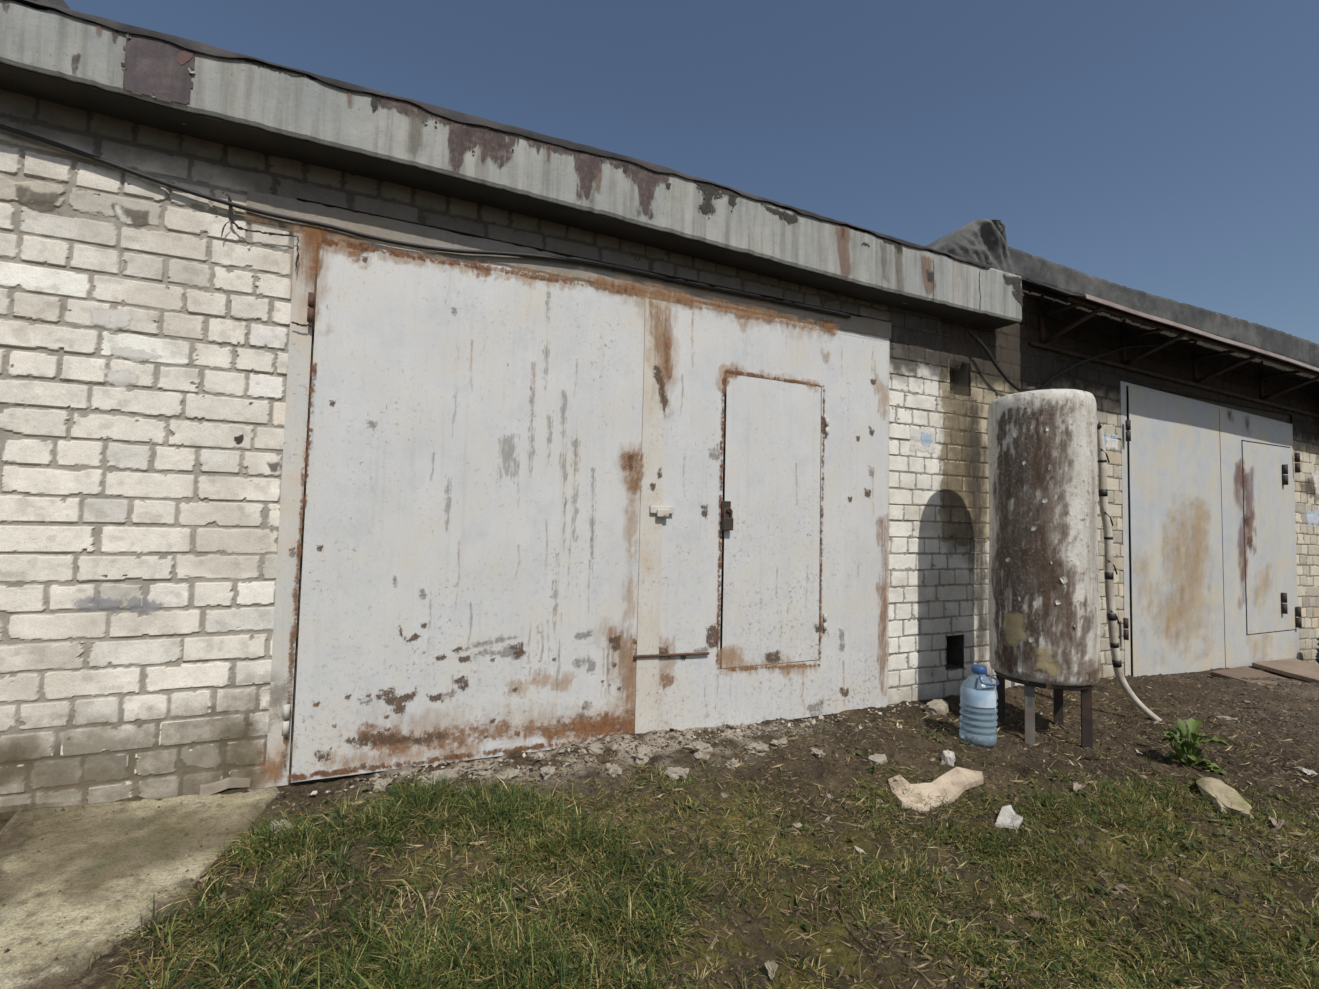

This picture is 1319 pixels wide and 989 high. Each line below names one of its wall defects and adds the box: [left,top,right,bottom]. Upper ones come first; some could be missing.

corrosion [653,335,673,413]
corrosion [621,452,662,493]
corrosion [716,369,825,671]
corrosion [1235,463,1254,580]
corrosion [258,363,635,781]
spalling [435,647,471,691]
spalling [511,642,525,658]
corrosion [659,646,686,688]
spalling [345,687,443,741]